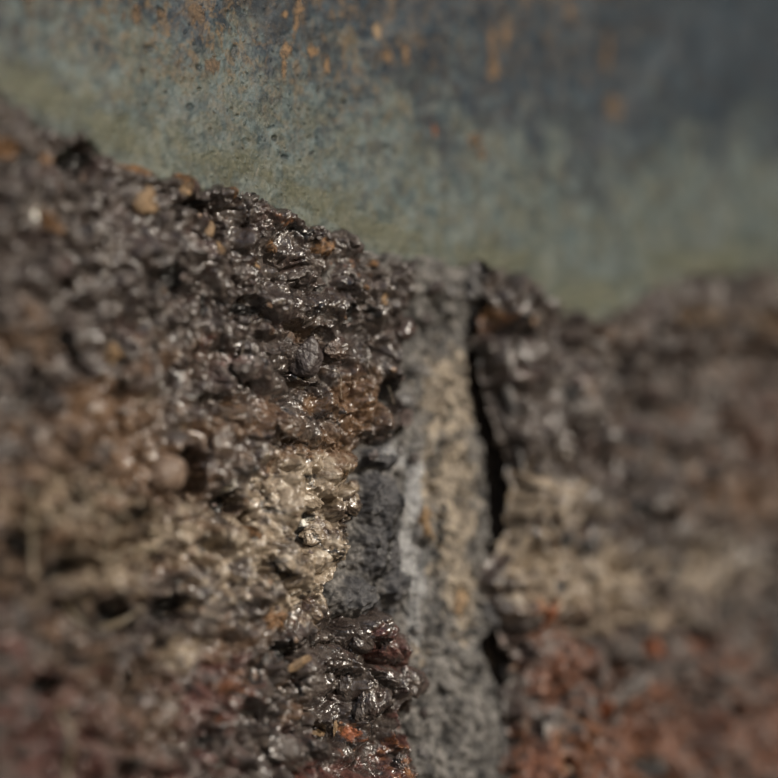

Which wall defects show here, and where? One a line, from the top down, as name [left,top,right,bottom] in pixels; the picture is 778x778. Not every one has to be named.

corrosion [280,0,304,77]
crack [463,330,512,560]
crack [478,614,516,760]